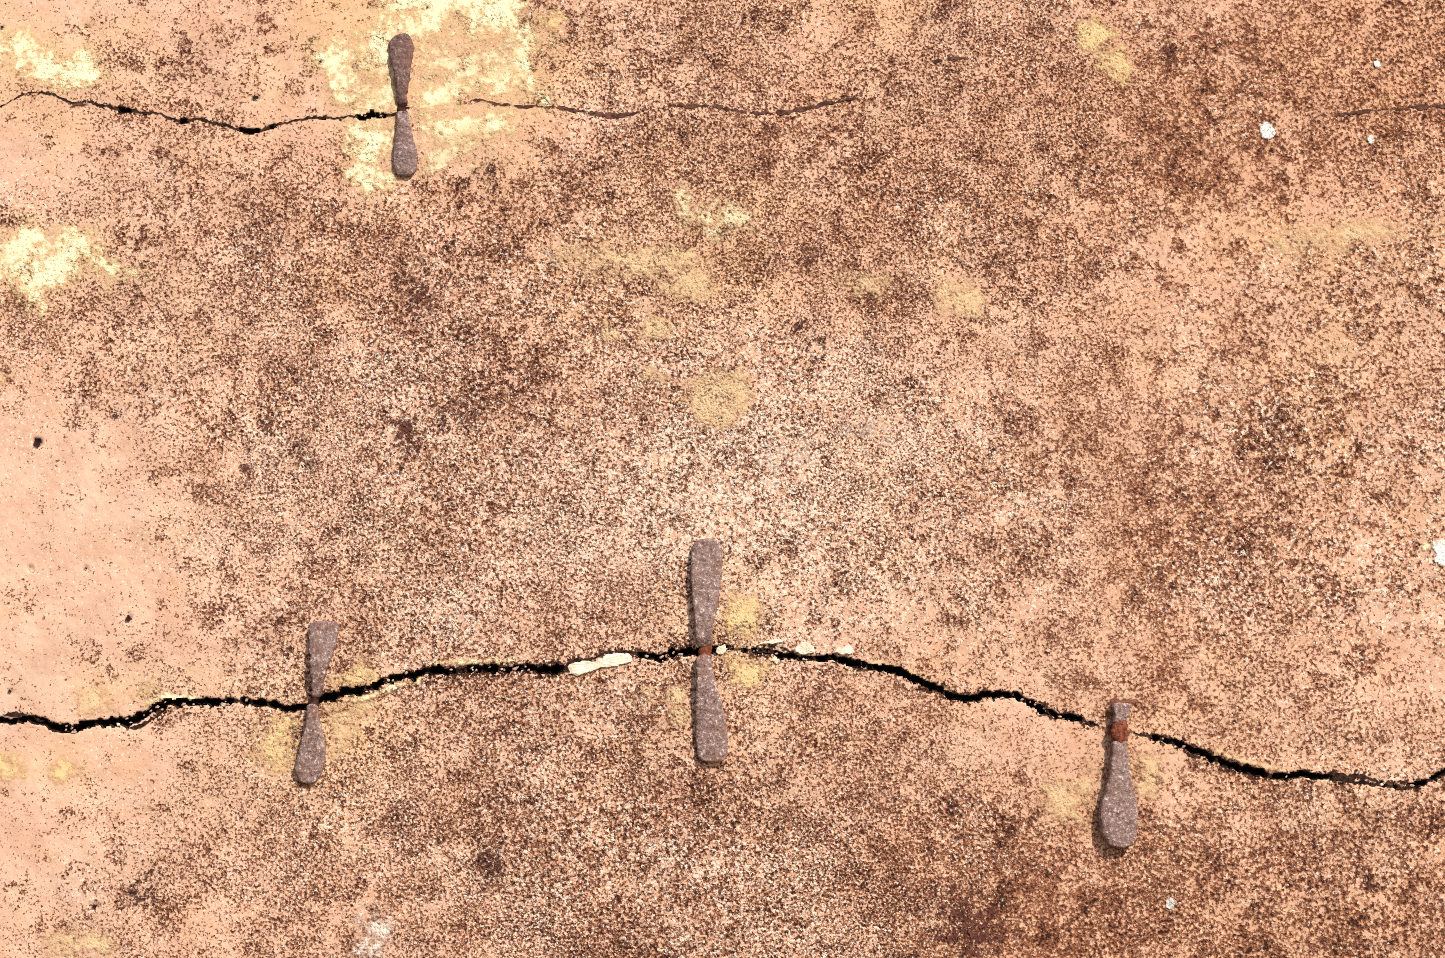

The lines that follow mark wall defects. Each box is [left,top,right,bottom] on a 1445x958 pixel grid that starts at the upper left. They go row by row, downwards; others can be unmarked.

crack [926,56,969,64]
crack [0,89,410,135]
crack [463,97,860,119]
crack [0,639,1445,793]